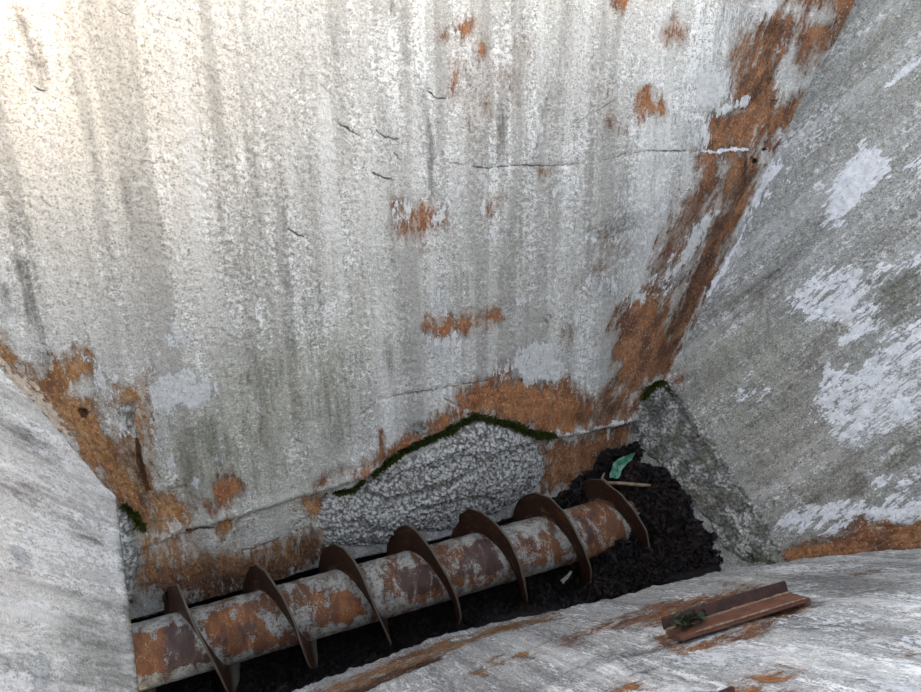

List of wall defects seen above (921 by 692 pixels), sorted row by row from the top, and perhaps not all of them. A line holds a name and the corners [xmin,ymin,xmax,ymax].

crack [452,161,574,169]
corrosion [353,0,855,495]
corrosion [0,341,327,605]
corrosion [782,516,921,562]
corrosion [315,612,562,692]
corrosion [610,681,652,692]
corrosion [560,582,813,655]
corrosion [735,665,793,692]